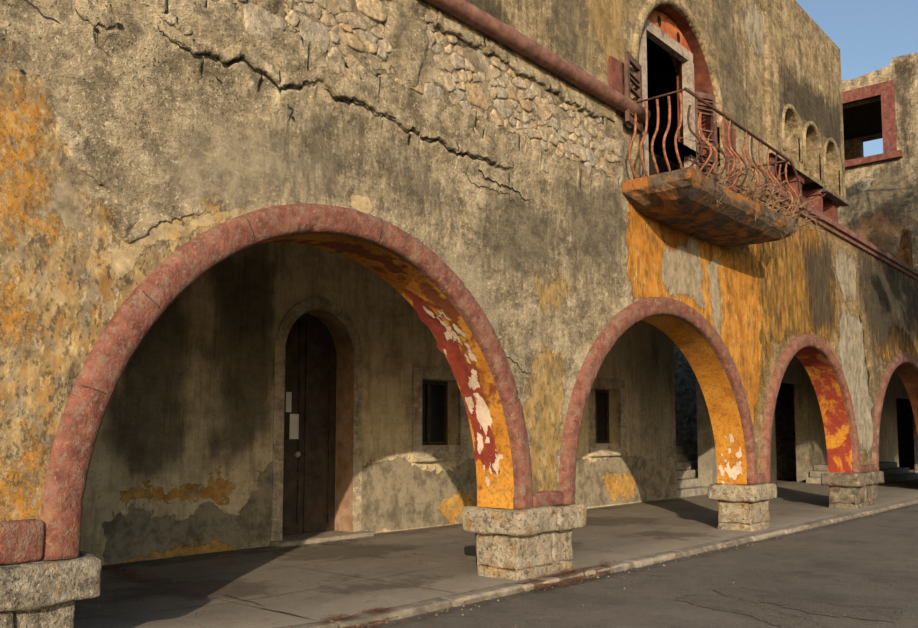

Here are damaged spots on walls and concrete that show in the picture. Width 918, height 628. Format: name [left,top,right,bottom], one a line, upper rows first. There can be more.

crack [25,0,627,206]
spalling [211,0,622,178]
peeling [0,46,248,521]
peeling [96,460,273,564]
peeling [361,289,503,533]
peeling [626,203,763,430]
peeling [719,434,742,484]